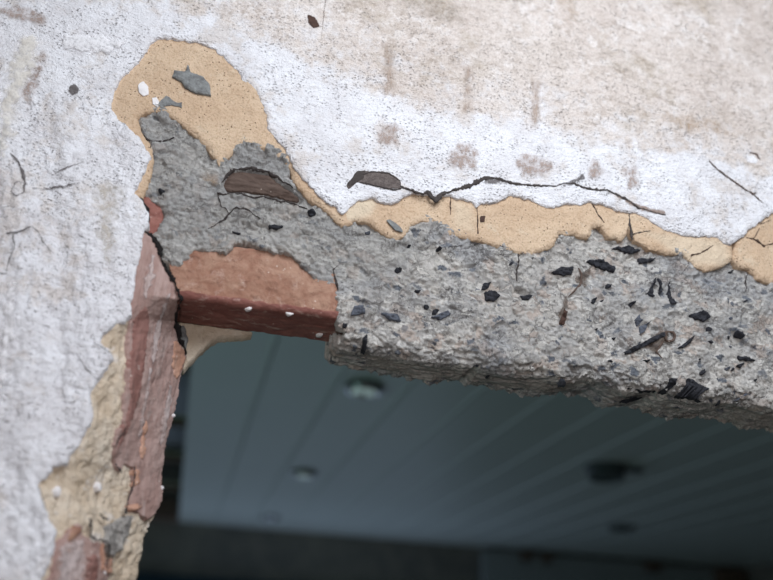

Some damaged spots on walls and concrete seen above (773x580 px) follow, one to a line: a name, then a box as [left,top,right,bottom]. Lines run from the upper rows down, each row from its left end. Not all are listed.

spalling [112,39,773,285]
crack [347,170,666,240]
flaking render [45,523,113,580]